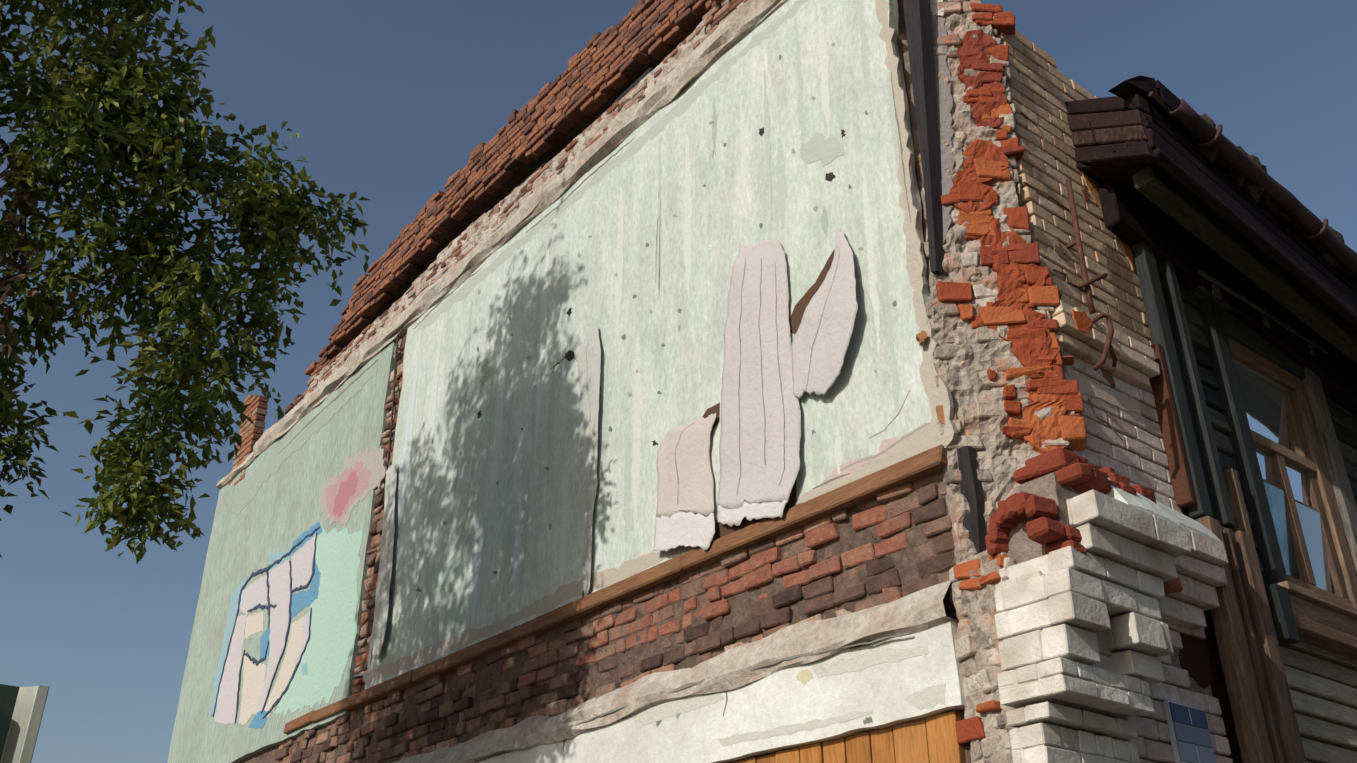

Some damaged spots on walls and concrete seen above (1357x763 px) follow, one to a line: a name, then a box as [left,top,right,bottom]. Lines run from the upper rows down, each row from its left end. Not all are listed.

spalling [294,0,747,407]
peeling [363,0,1093,685]